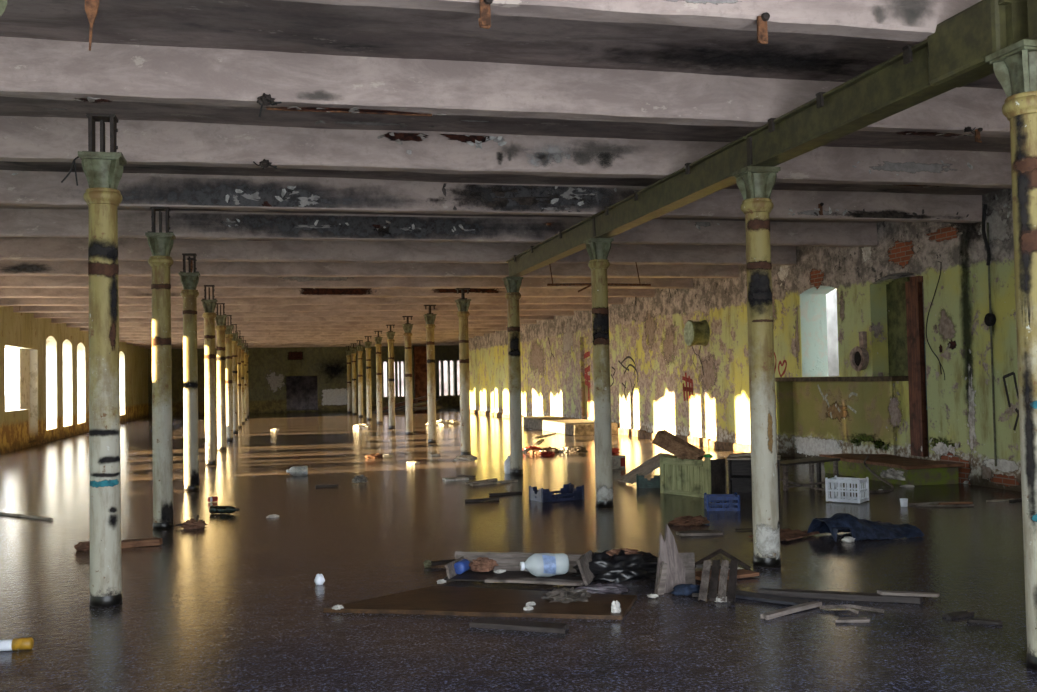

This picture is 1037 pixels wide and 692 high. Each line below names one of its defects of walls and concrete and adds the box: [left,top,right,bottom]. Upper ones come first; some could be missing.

peeling [845,209,969,242]
peeling [978,194,1011,247]
spalling [808,267,825,289]
spalling [885,239,916,268]
water stain [960,235,973,401]
water stain [1022,352,1037,522]